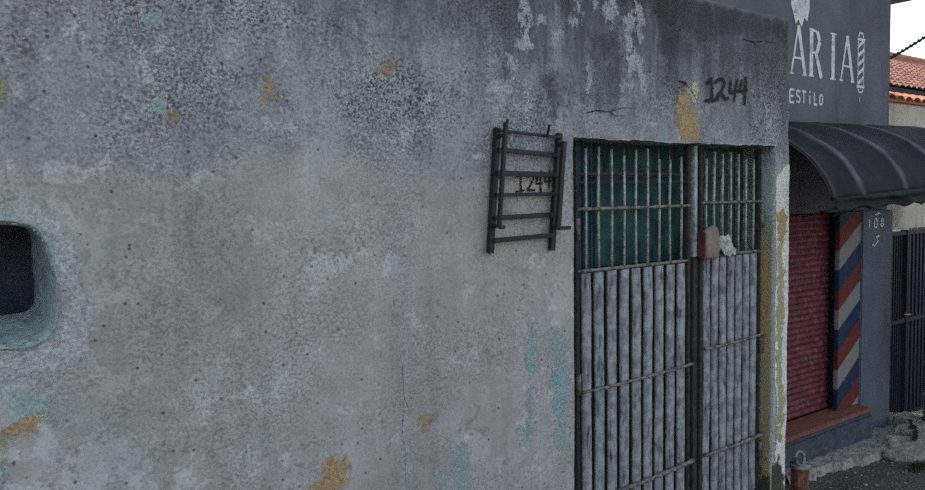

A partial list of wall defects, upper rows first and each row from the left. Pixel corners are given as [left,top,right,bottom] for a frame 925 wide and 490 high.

leakage [486,0,546,102]
leakage [594,0,645,90]
spalling [0,225,34,316]
leakage [758,215,786,490]
peeling [2,413,42,439]
peeling [307,455,351,490]